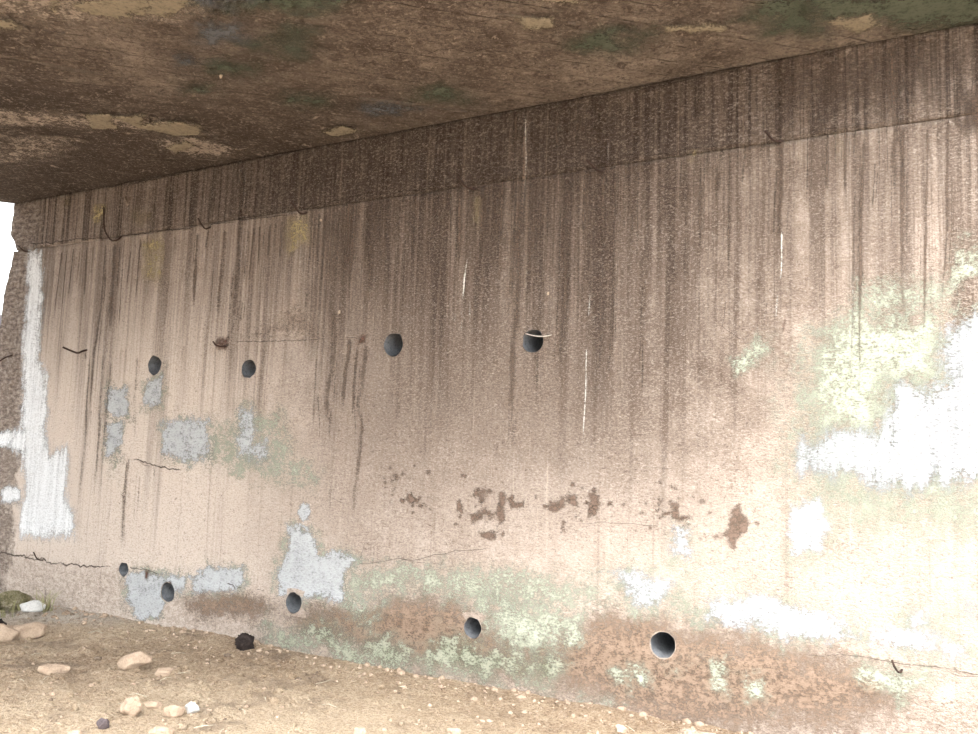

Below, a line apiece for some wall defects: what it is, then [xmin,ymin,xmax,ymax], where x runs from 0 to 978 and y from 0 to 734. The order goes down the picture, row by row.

leakage [777,34,978,366]
leakage [42,237,163,476]
peeling [103,370,215,470]
peeling [236,403,269,464]
leakage [319,312,368,496]
peeling [271,520,365,611]
leakage [454,488,524,540]
leakage [535,482,625,533]
leakage [640,481,689,529]
leakage [714,504,759,551]
leakage [290,592,911,734]
crack [809,654,978,677]